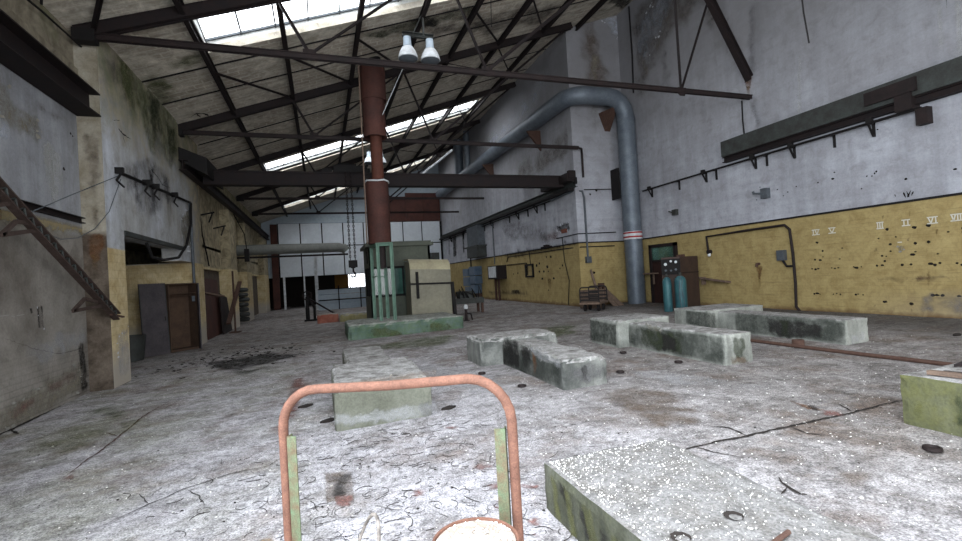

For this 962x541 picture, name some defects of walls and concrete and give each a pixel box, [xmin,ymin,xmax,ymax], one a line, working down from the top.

crack [686,400,902,457]